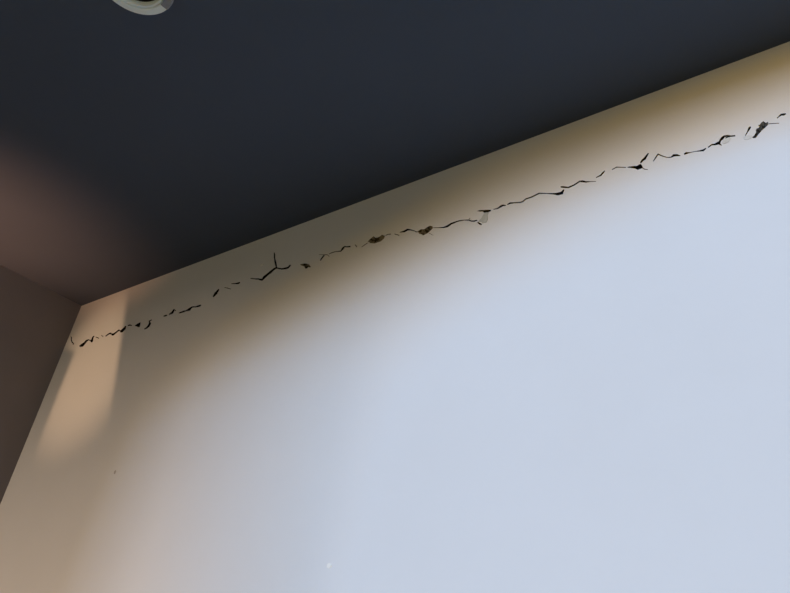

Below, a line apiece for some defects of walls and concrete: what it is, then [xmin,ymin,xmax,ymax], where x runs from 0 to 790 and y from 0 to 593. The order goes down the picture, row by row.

crack [493,127,751,210]
crack [319,243,367,261]
crack [385,218,477,236]
crack [71,253,291,347]